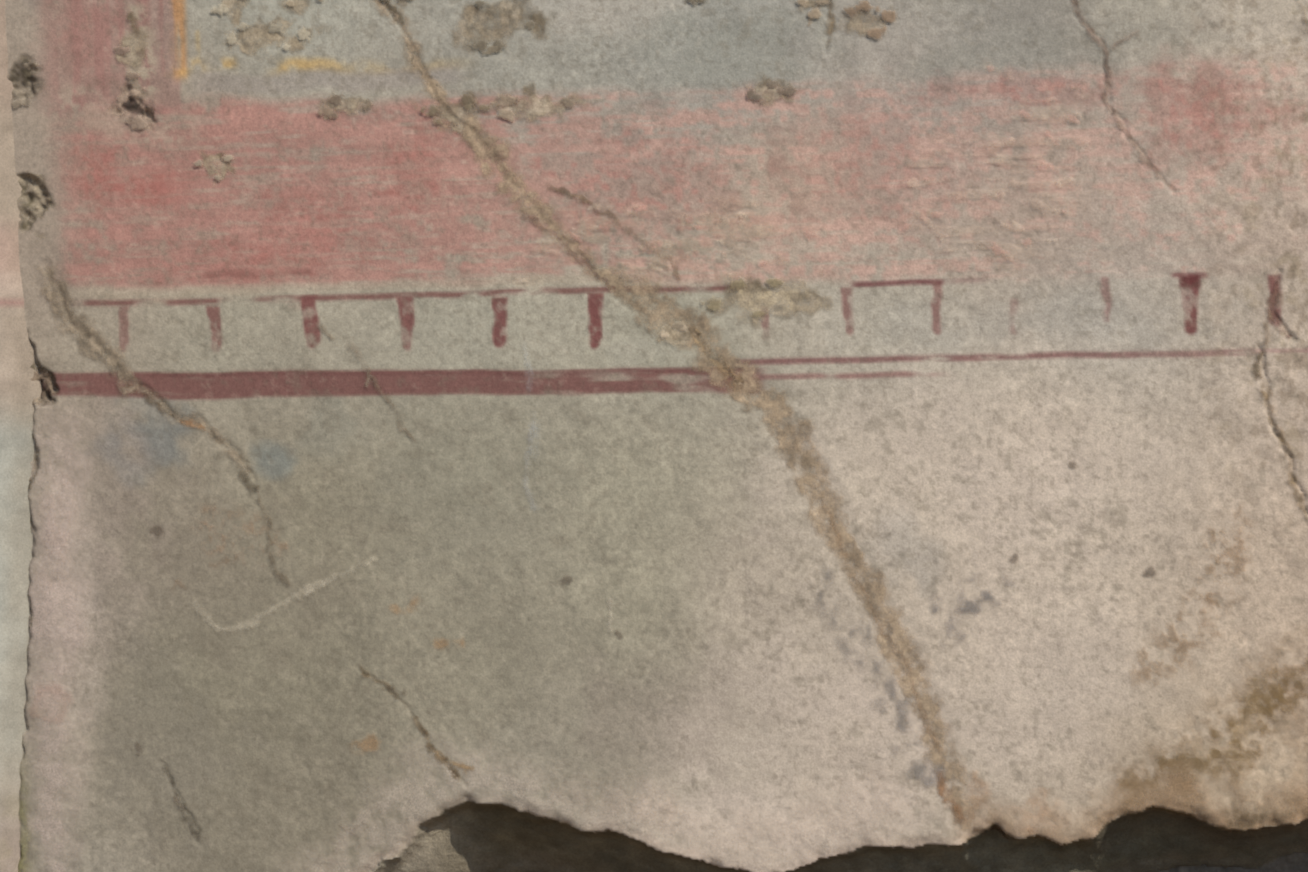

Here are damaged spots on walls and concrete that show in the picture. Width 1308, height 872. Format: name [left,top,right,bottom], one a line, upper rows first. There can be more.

spalling [8,55,42,108]
spalling [110,12,154,129]
spalling [211,0,323,54]
spalling [453,0,546,54]
spalling [420,84,584,132]
crack [1071,0,1161,178]
spalling [17,173,53,237]
crack [28,434,37,488]
crack [42,268,290,584]
crack [362,0,1005,835]
crack [1255,280,1308,519]
water stain [1084,660,1308,837]